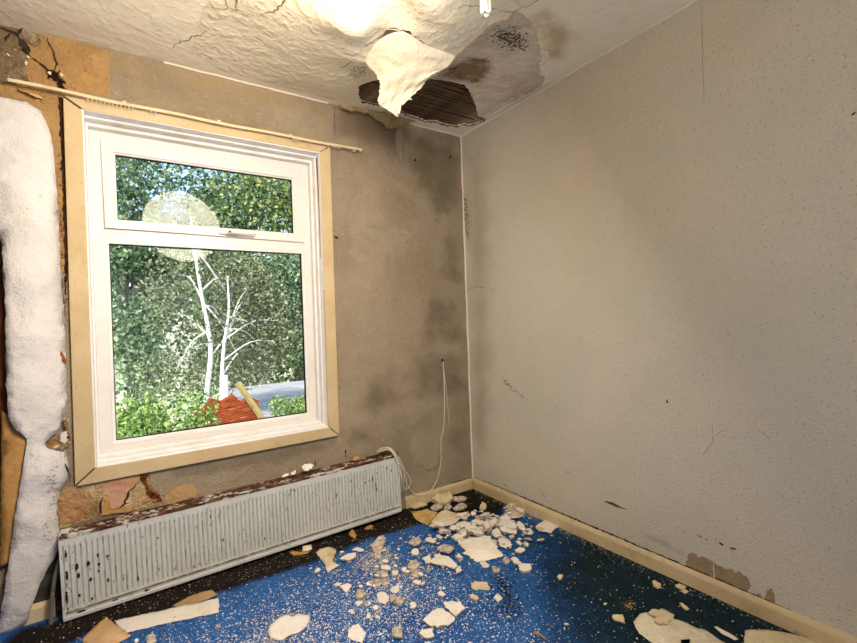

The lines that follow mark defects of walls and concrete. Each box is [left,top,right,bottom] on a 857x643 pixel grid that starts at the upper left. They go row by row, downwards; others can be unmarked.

crack [209,0,285,16]
crack [0,27,58,73]
leakage [444,58,488,82]
flaking render [430,11,545,118]
mould [481,22,537,54]
crack [58,97,68,303]
flaking render [57,472,196,531]
flaking render [33,549,62,615]
peeling [686,552,775,603]